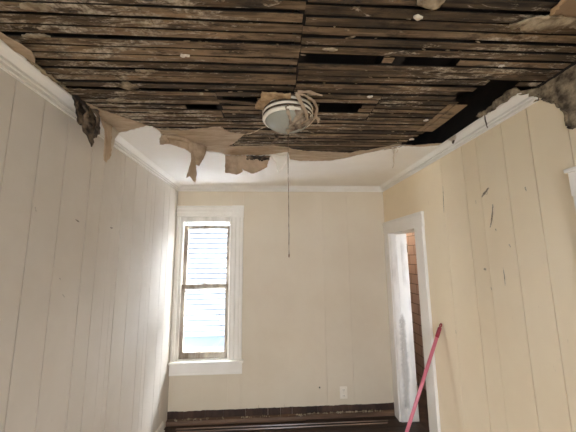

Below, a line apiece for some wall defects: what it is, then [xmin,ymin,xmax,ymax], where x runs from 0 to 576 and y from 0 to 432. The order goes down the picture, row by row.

water stain [72,95,100,147]
spalling [536,65,576,129]